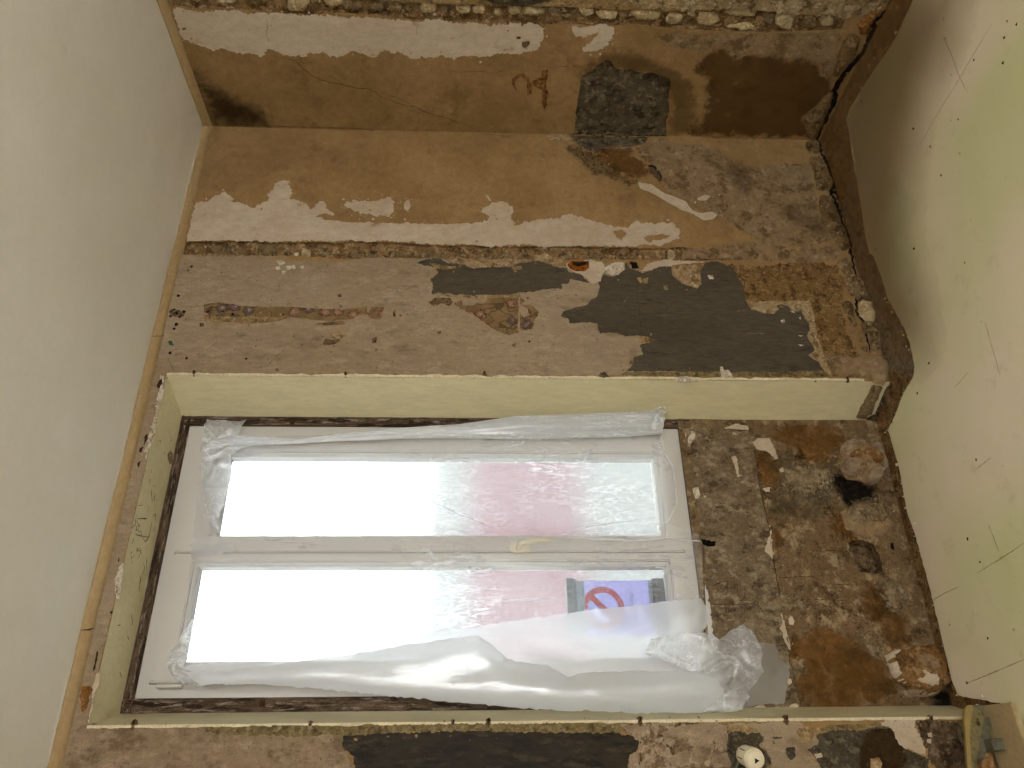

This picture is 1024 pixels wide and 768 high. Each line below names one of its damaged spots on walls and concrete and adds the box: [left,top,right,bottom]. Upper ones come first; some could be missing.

damp [199,84,266,126]
flaking render [172,0,889,78]
damp [689,49,830,138]
flaking render [184,91,868,355]
crack [816,0,891,352]
damp [755,423,893,546]
damp [790,581,911,707]